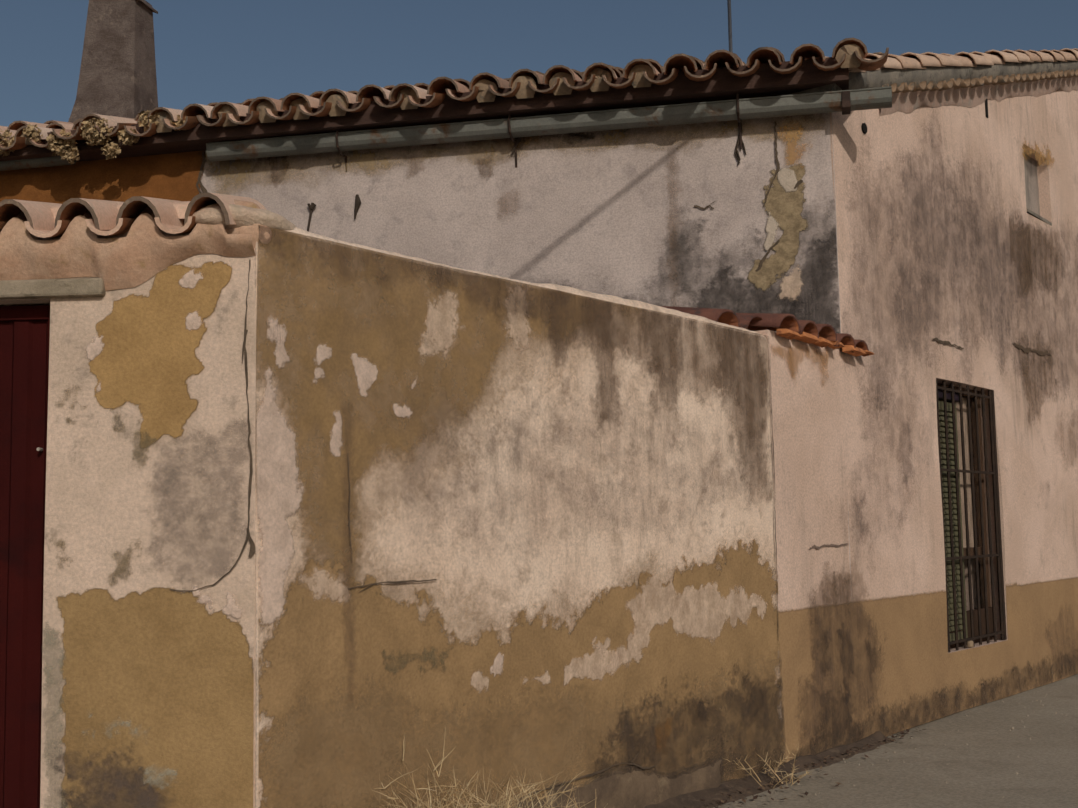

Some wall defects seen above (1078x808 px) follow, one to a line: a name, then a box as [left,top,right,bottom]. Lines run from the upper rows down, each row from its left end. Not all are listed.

flaking render [748,124,808,300]
peeling [86,261,232,461]
crack [170,260,256,591]
leakage [256,225,840,571]
leakage [1022,338,1057,422]
peeling [57,369,785,808]
leakage [507,574,1076,789]